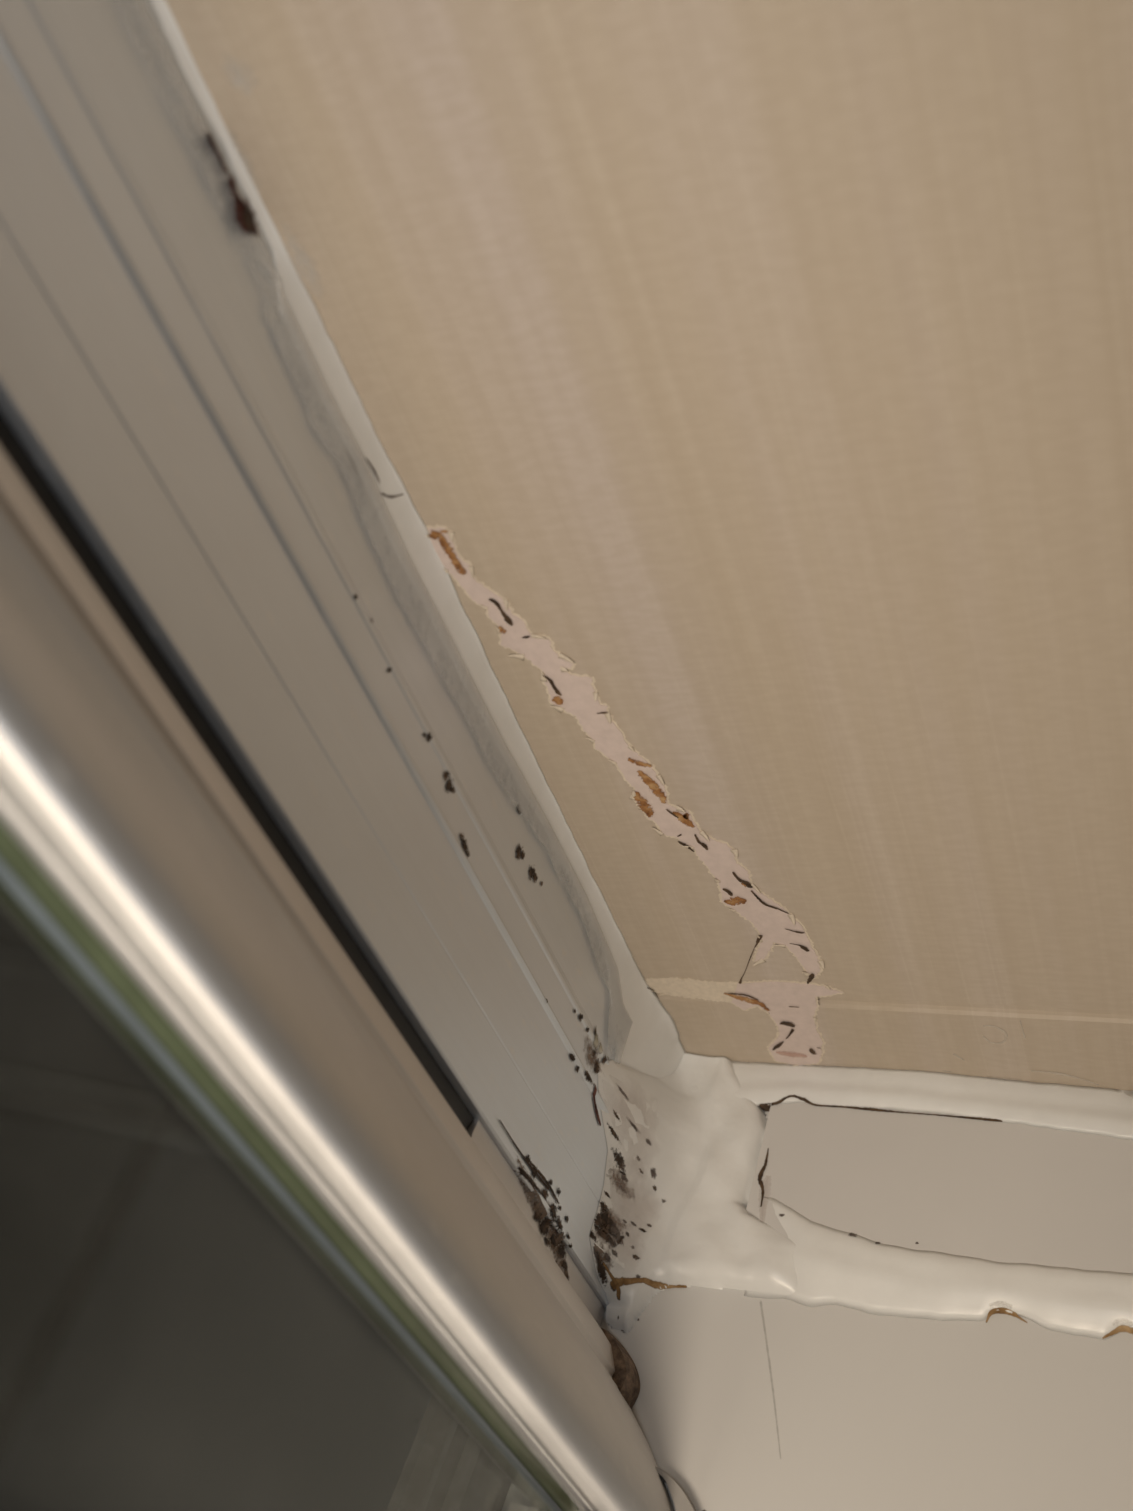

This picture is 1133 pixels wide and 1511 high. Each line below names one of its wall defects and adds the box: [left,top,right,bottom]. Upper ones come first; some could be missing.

water stain [205,132,258,236]
peeling [426,524,844,1066]
water stain [499,1120,572,1281]
water stain [569,1010,665,1319]
crack [757,1148,769,1207]
crack [759,1095,1002,1122]